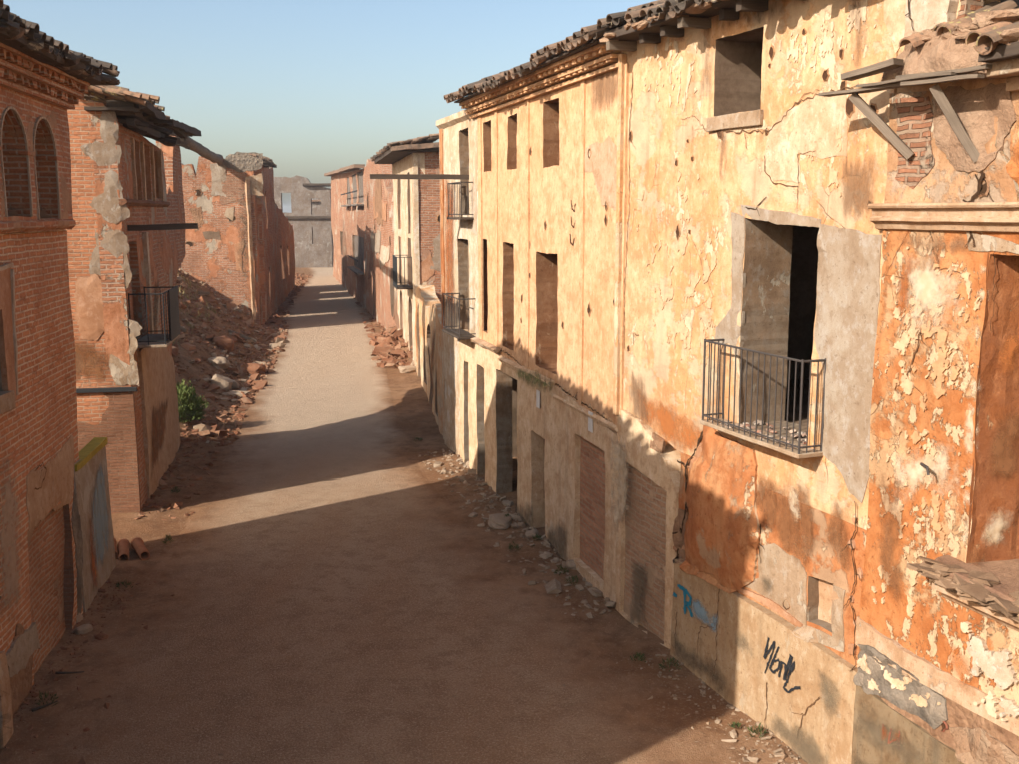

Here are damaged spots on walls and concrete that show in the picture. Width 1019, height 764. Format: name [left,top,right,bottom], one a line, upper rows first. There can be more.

flaking render [641,37,855,197]
crack [683,86,855,216]
flaking render [895,96,935,189]
peeling [646,158,719,310]
peeling [664,297,716,367]
peeling [885,243,983,412]
crack [672,431,703,563]
peeling [896,427,962,482]
crack [842,501,863,671]
peeling [871,565,894,604]
spalling [853,644,1019,764]
peeling [960,621,1019,722]